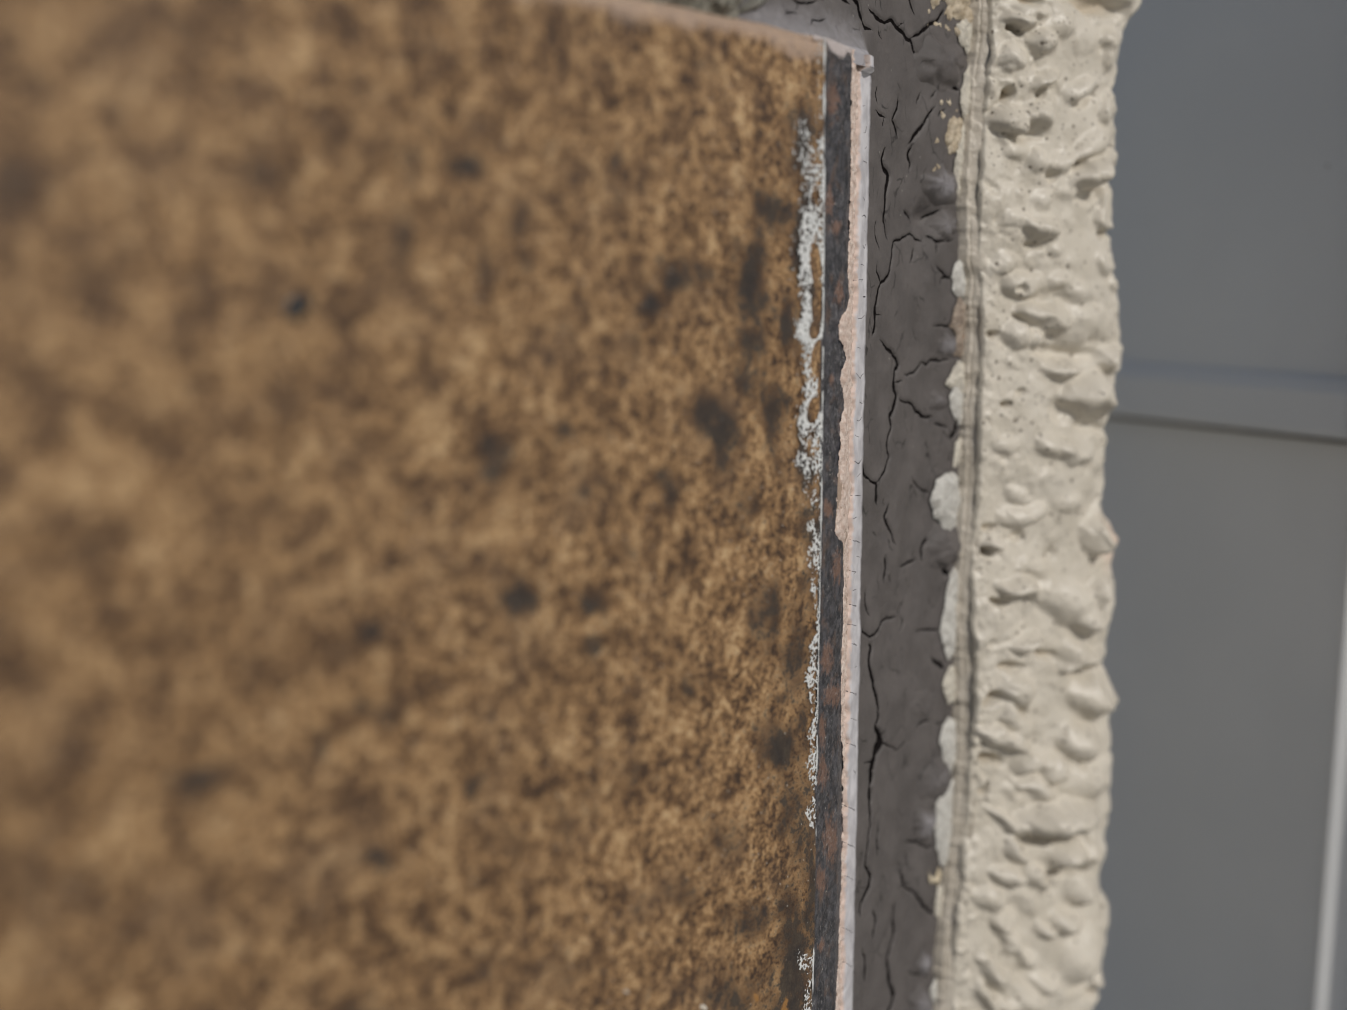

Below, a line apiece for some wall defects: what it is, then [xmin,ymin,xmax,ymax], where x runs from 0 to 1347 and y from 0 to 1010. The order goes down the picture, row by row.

damp [790,33,853,829]
crack [785,0,959,1010]
damp [797,949,815,1010]